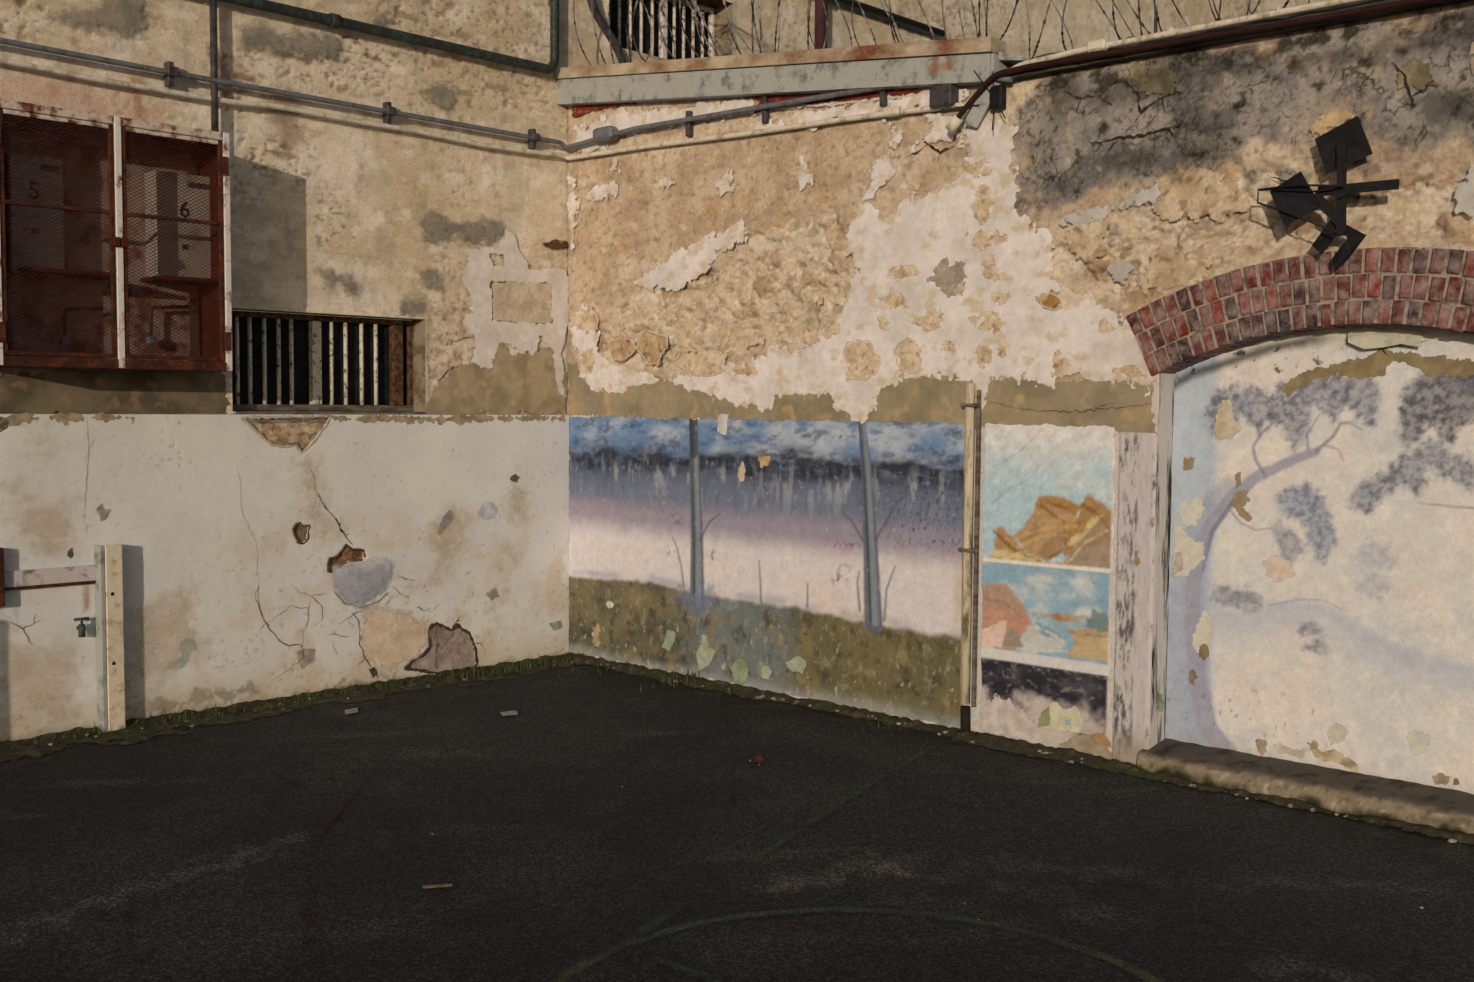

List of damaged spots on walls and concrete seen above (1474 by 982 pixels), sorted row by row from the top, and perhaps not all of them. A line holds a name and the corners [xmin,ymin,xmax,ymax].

flaking render [1396,58,1439,90]
flaking render [1308,109,1354,138]
flaking render [1453,164,1474,221]
flaking render [241,85,1251,454]
peeling [1280,327,1474,397]
flaking render [327,544,366,573]
crack [237,459,484,680]
peeling [1172,498,1205,577]
peeling [362,606,479,678]
peeling [1189,610,1214,685]
peeling [1255,723,1358,773]
peeling [1432,773,1459,785]